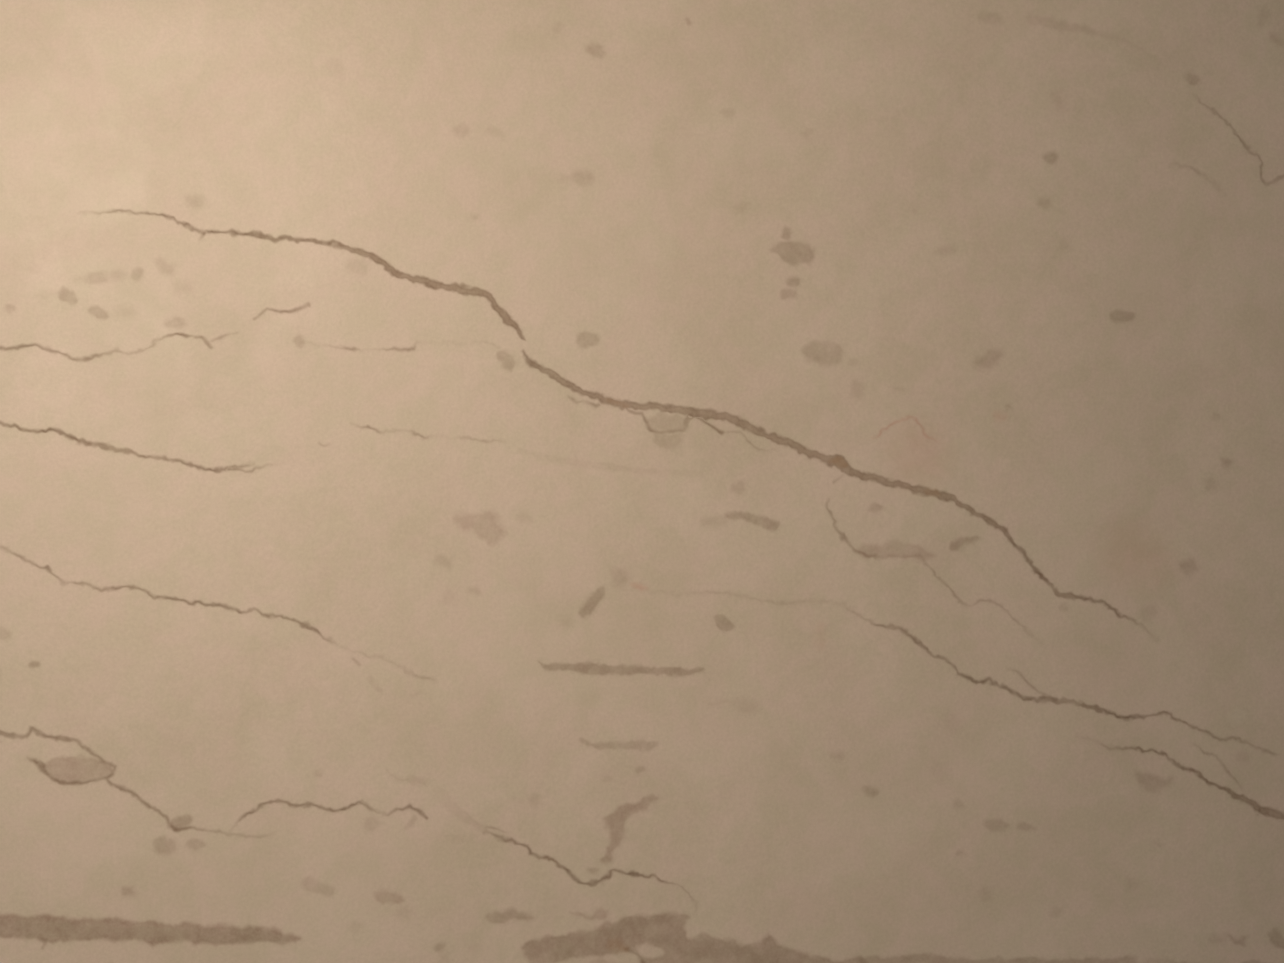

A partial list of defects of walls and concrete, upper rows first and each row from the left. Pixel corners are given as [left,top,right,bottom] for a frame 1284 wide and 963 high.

crack [1191,90,1284,187]
crack [0,207,1284,821]
leakage [536,658,706,679]
crack [0,725,700,918]
leakage [585,792,662,877]
leakage [0,911,304,952]
leakage [483,903,1224,963]